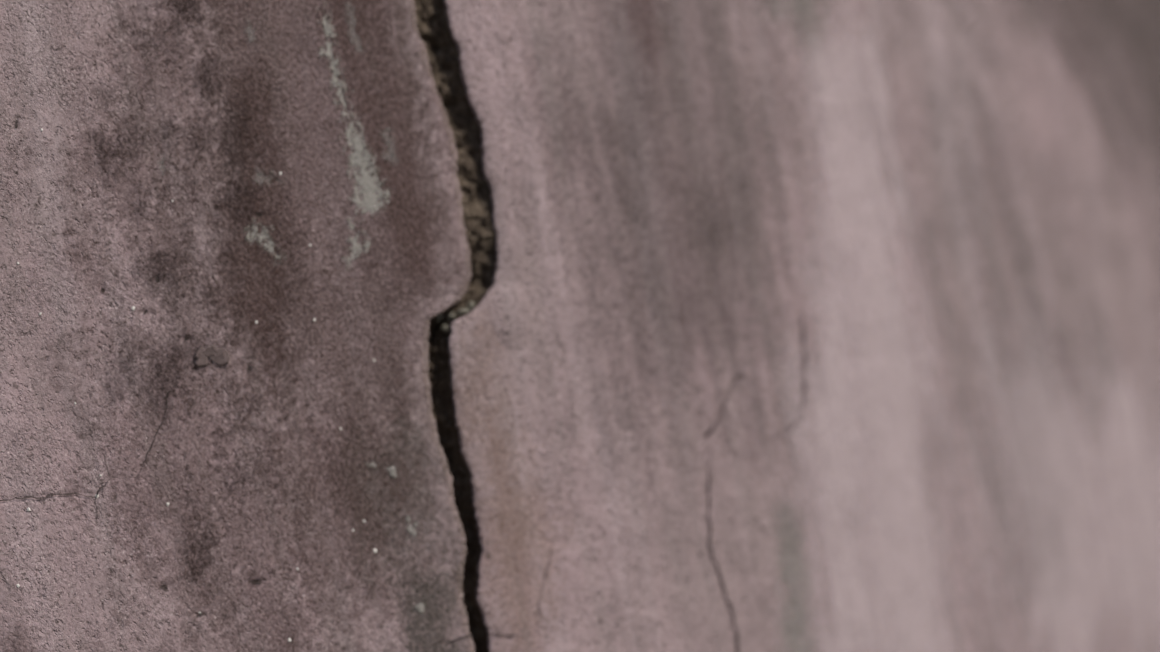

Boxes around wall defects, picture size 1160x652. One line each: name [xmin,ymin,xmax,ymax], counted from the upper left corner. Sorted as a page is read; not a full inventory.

crack [0,376,177,522]
crack [414,0,519,652]